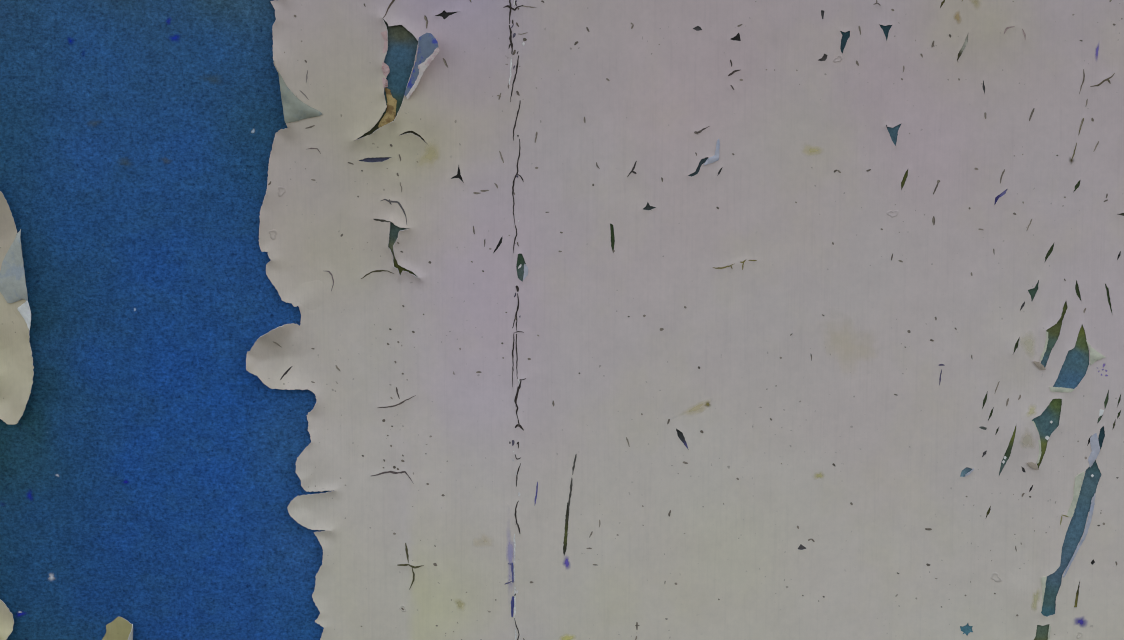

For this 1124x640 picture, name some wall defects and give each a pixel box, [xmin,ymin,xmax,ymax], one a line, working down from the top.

peeling [358,20,439,139]
peeling [688,139,723,177]
peeling [886,124,901,146]
peeling [388,222,417,277]
peeling [0,0,334,640]
crack [503,0,538,640]
peeling [1022,280,1106,472]
crack [568,454,577,513]
peeling [999,426,1016,475]
peeling [1034,390,1121,640]